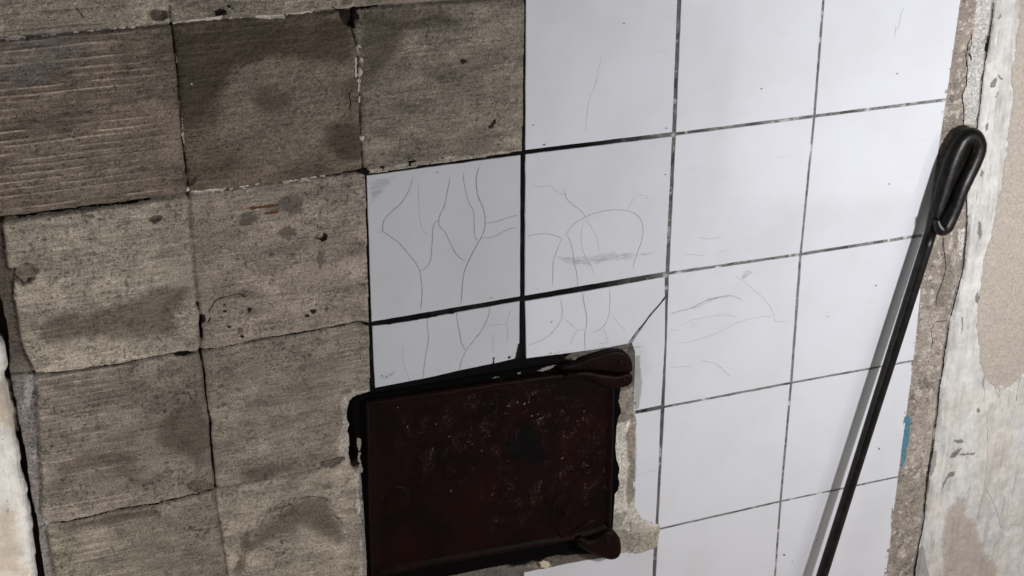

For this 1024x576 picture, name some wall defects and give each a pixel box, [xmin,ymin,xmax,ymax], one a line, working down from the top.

crack [962,3,994,128]
corrosion [250,204,279,215]
crack [382,169,643,377]
crack [628,296,666,348]
crack [914,197,968,576]
peeling [975,0,1024,389]